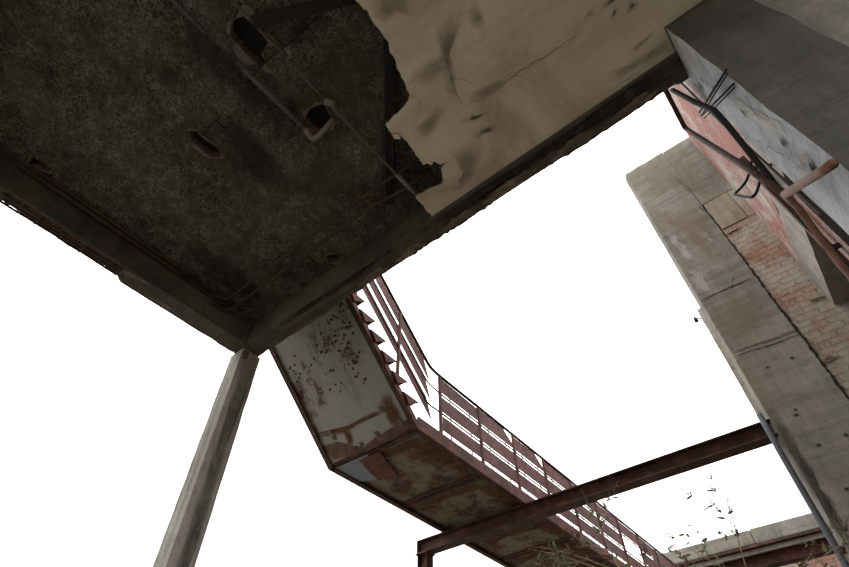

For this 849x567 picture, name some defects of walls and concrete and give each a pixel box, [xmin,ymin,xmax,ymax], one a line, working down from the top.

spalling [226,5,279,74]
peeling [386,96,434,165]
spalling [550,89,658,161]
spalling [437,167,538,234]
rust [287,302,368,384]
rust [321,397,466,473]